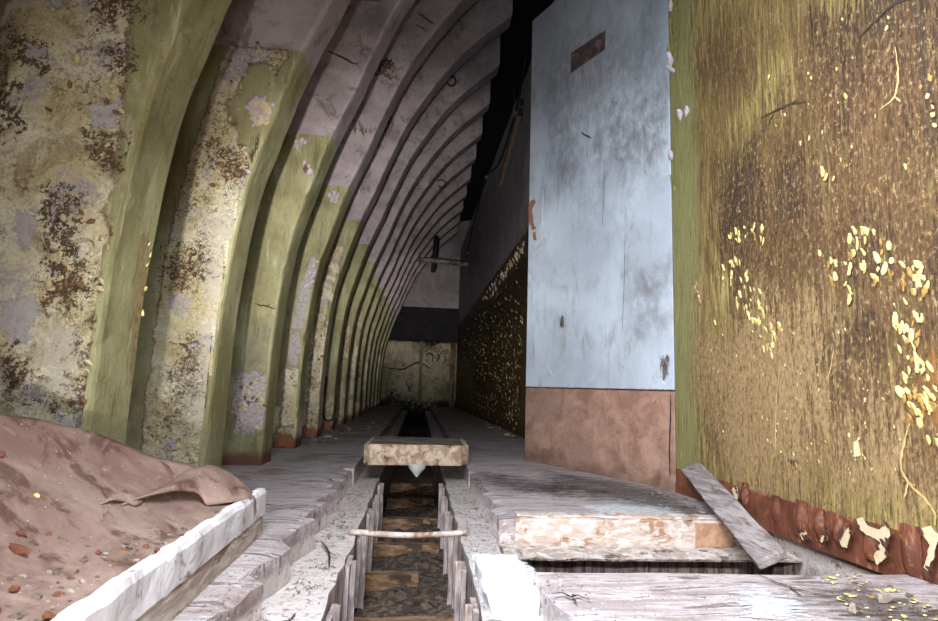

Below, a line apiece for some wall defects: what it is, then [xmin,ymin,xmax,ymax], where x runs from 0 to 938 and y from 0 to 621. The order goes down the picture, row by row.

peeling [0,0,150,427]
peeling [127,41,290,467]
peeling [278,245,345,430]
damp [690,4,766,113]
peeling [688,0,938,581]
damp [706,0,938,426]